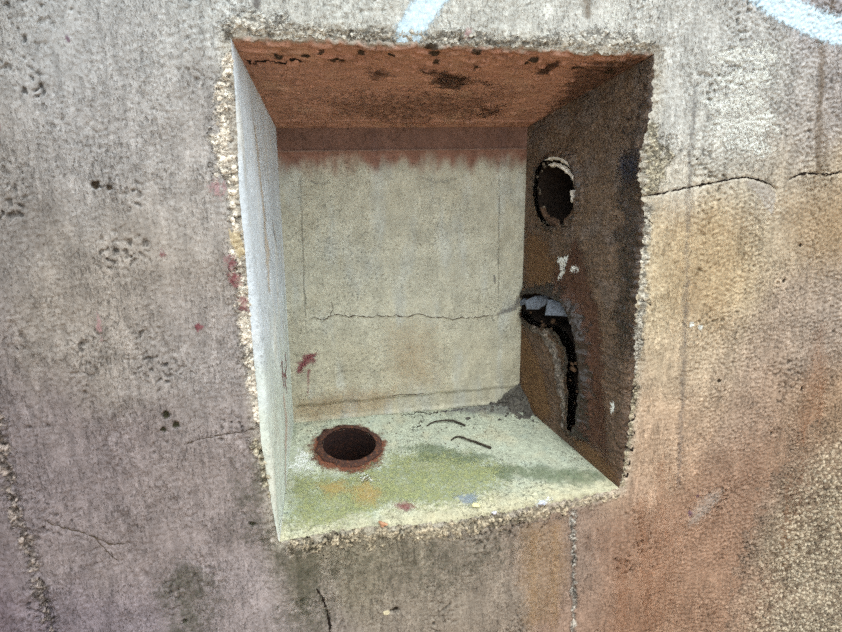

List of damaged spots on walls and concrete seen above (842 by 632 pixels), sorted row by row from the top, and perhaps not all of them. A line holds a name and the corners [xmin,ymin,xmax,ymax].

spalling [205,3,656,427]
crack [641,171,842,224]
crack [313,306,498,320]
spalling [285,119,682,632]
corrosion [520,327,550,421]
corrosion [525,234,618,483]
spalling [246,437,271,499]
corrosion [309,425,387,474]
crack [316,588,332,632]